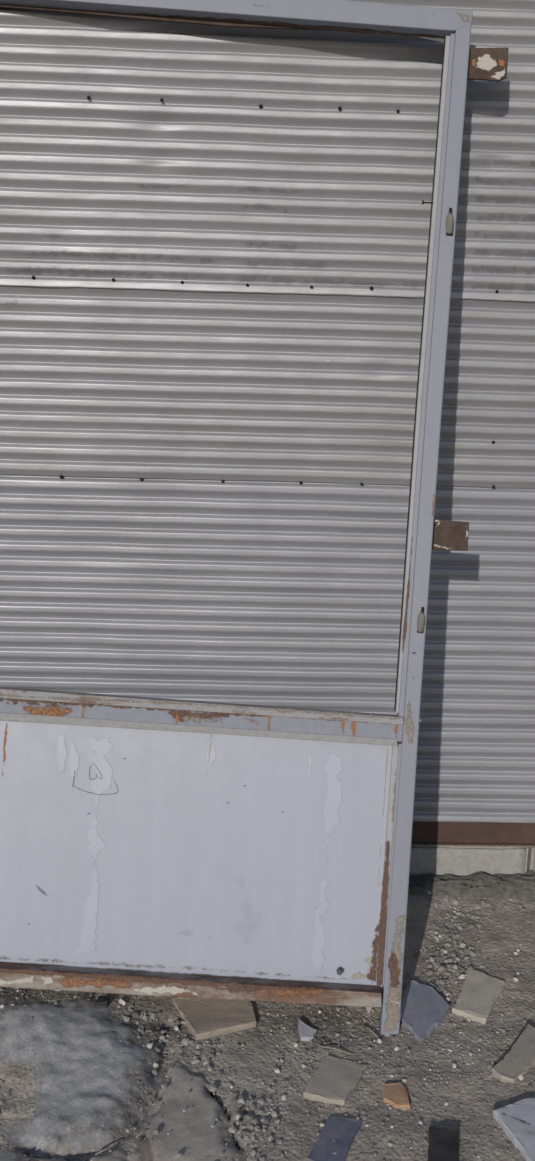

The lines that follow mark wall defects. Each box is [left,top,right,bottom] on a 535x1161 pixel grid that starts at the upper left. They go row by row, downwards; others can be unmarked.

rust [0,698,271,730]
rust [348,841,390,993]
rust [0,967,329,997]